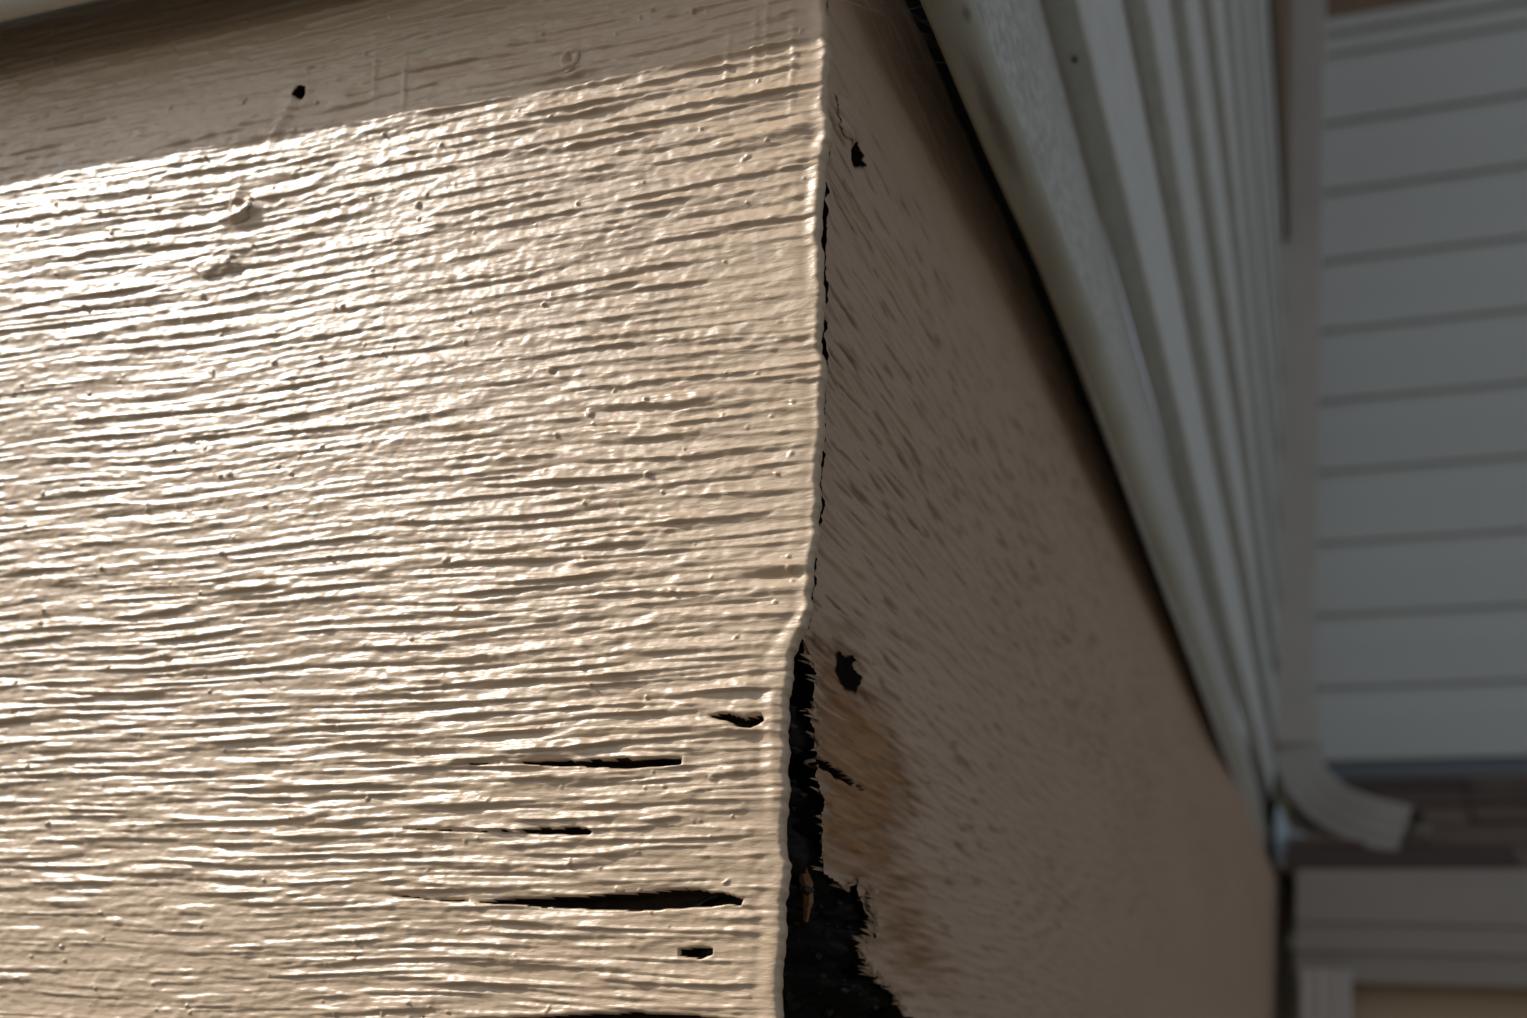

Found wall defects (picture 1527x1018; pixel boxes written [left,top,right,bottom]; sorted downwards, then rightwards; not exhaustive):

crack [469,758,682,769]
peeling [811,648,931,967]
crack [401,888,743,911]
crack [681,948,713,959]
crack [540,1010,703,1018]